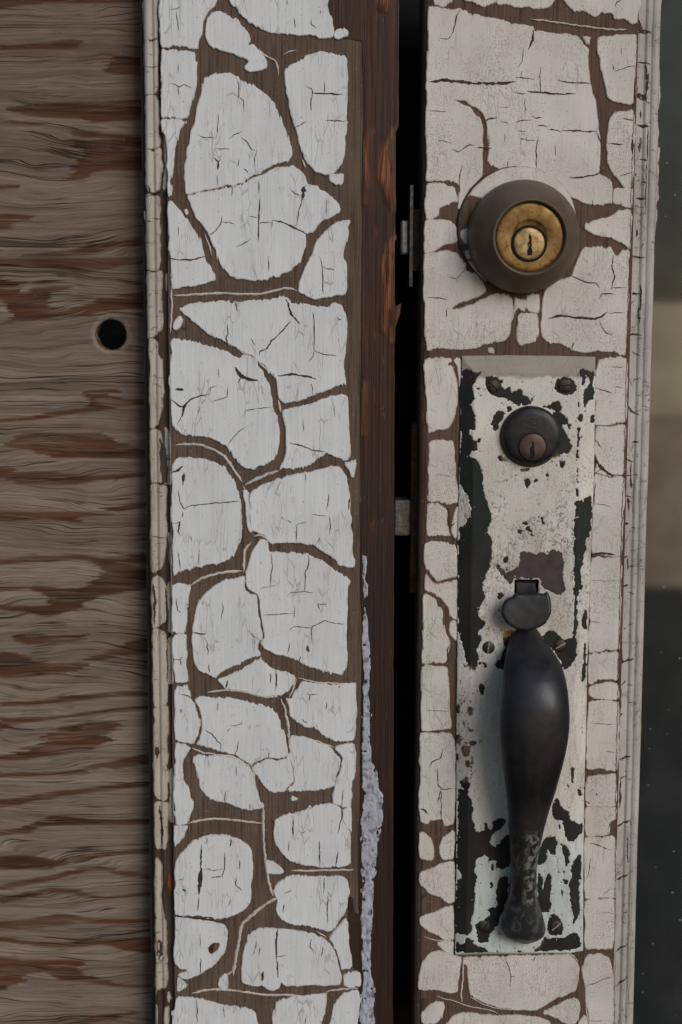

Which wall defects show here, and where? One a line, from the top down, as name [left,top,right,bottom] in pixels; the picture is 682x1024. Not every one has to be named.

crack [145,0,360,1024]
peeling [142,0,383,1024]
peeling [417,0,642,1024]
crack [420,0,651,1024]